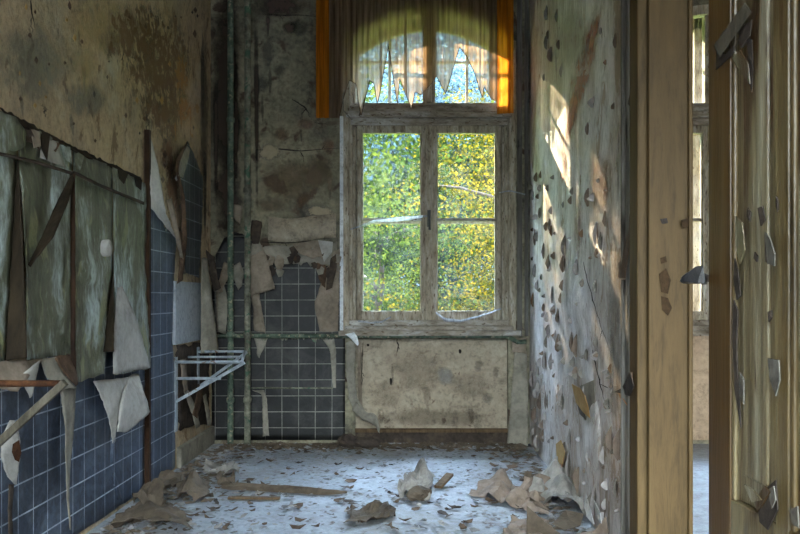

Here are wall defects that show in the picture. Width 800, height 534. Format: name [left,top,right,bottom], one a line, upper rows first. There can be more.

flaking render [0,107,142,190]
leakage [106,5,191,138]
leakage [200,0,242,235]
leakage [254,0,306,163]
peeling [543,30,562,77]
rust [565,21,598,134]
flaking render [263,240,341,277]
peeling [735,206,776,266]
peeling [528,171,634,524]
peeling [767,358,781,396]
peeling [744,480,779,530]